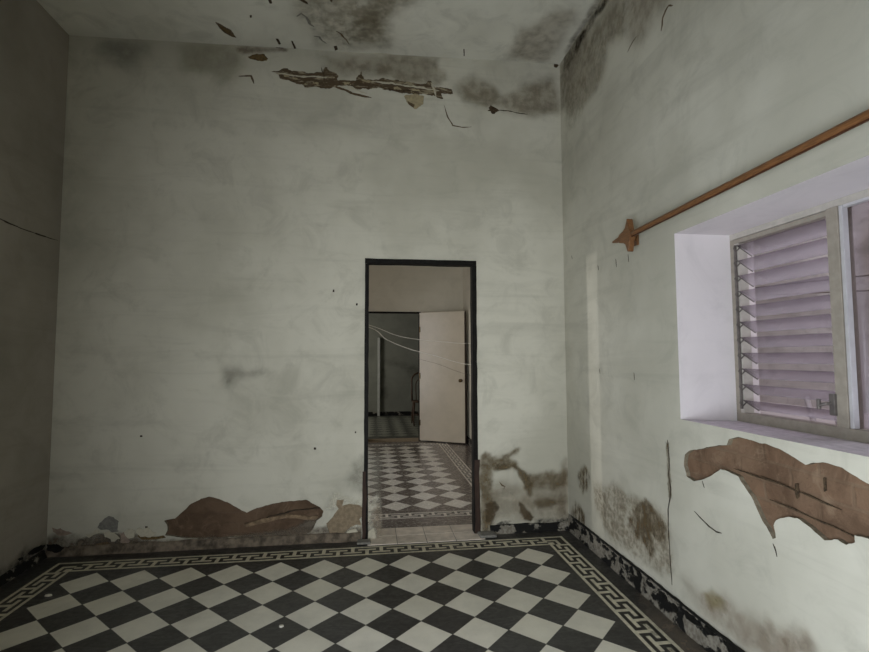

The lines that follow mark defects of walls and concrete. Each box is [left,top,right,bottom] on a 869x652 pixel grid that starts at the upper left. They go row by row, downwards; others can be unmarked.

peeling [244,49,268,61]
peeling [271,67,453,109]
crack [0,218,58,241]
flaking render [138,497,378,540]
damp [479,449,566,531]
damp [603,491,670,566]
crack [665,440,673,581]
flaking render [684,437,869,545]
peeling [571,515,745,652]